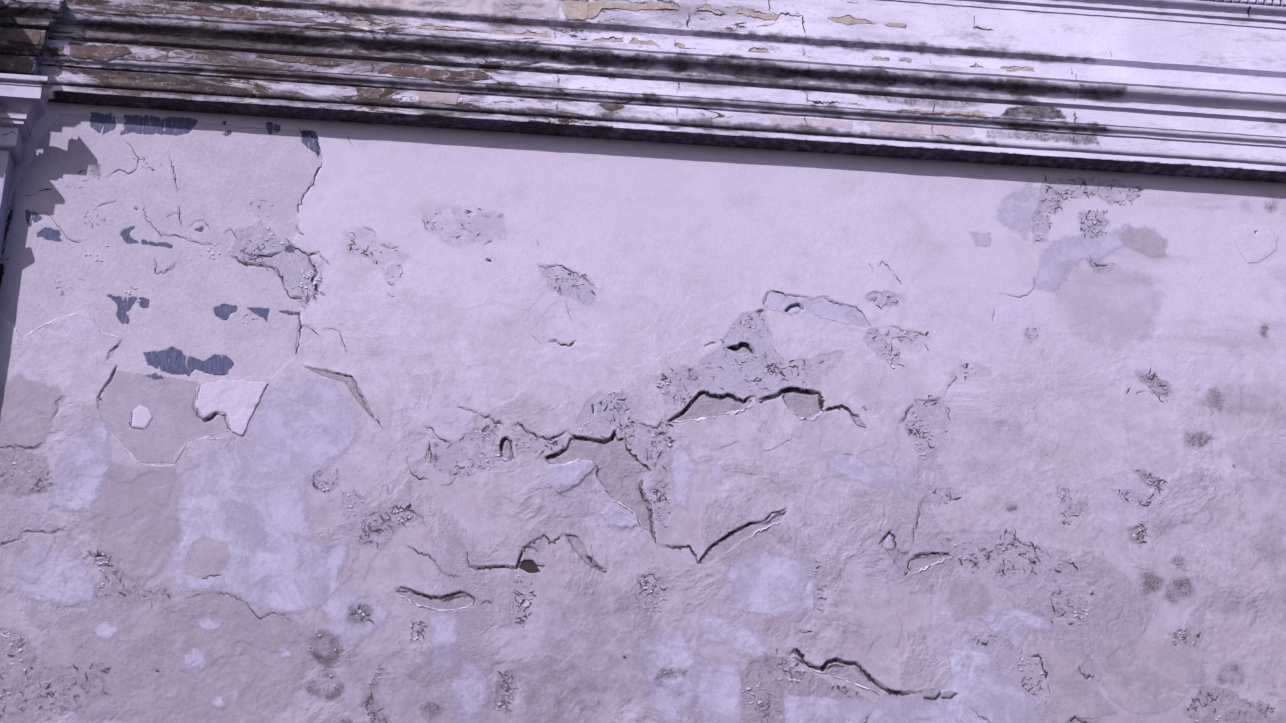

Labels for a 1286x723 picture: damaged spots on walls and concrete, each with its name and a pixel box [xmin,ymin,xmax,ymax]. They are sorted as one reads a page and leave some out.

spalling [90,4,324,23]
peeling [322,0,779,38]
spalling [828,15,906,27]
spalling [594,36,659,46]
spalling [356,64,494,104]
leakage [61,18,1126,143]
spalling [768,109,987,137]
peeling [0,106,421,641]
crack [460,407,565,440]
crack [354,426,459,577]
peeling [1115,470,1167,506]
crack [524,534,565,551]